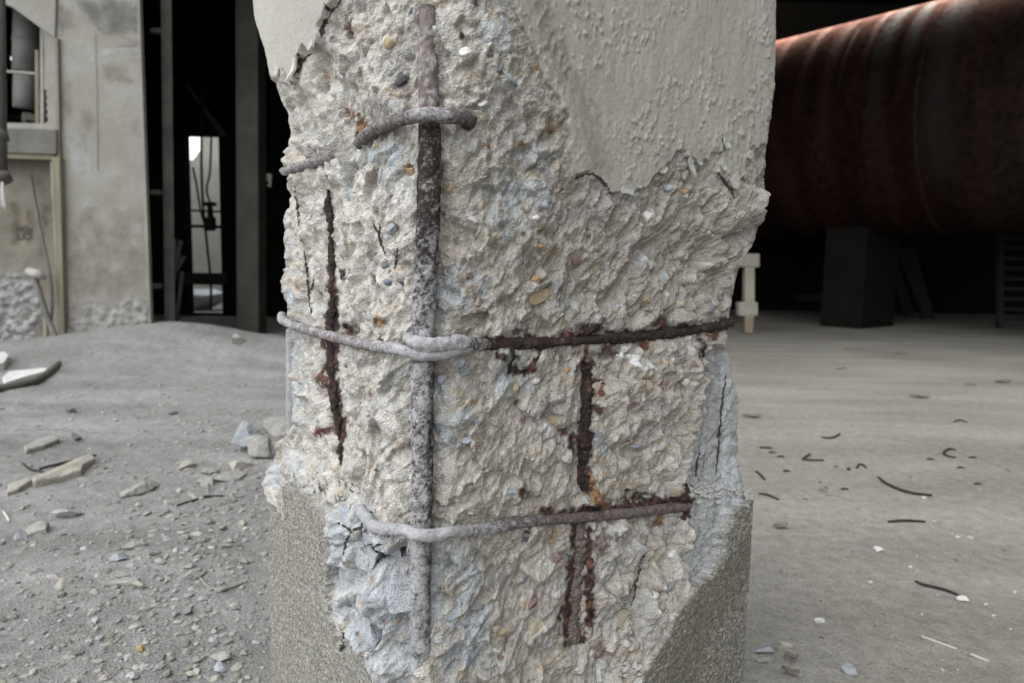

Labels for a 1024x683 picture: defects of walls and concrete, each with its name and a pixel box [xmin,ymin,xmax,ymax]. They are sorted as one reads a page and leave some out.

rust [345,107,367,136]
rust [314,251,360,467]
spalling [261,0,771,683]
rust [495,314,728,658]
crack [695,375,726,477]